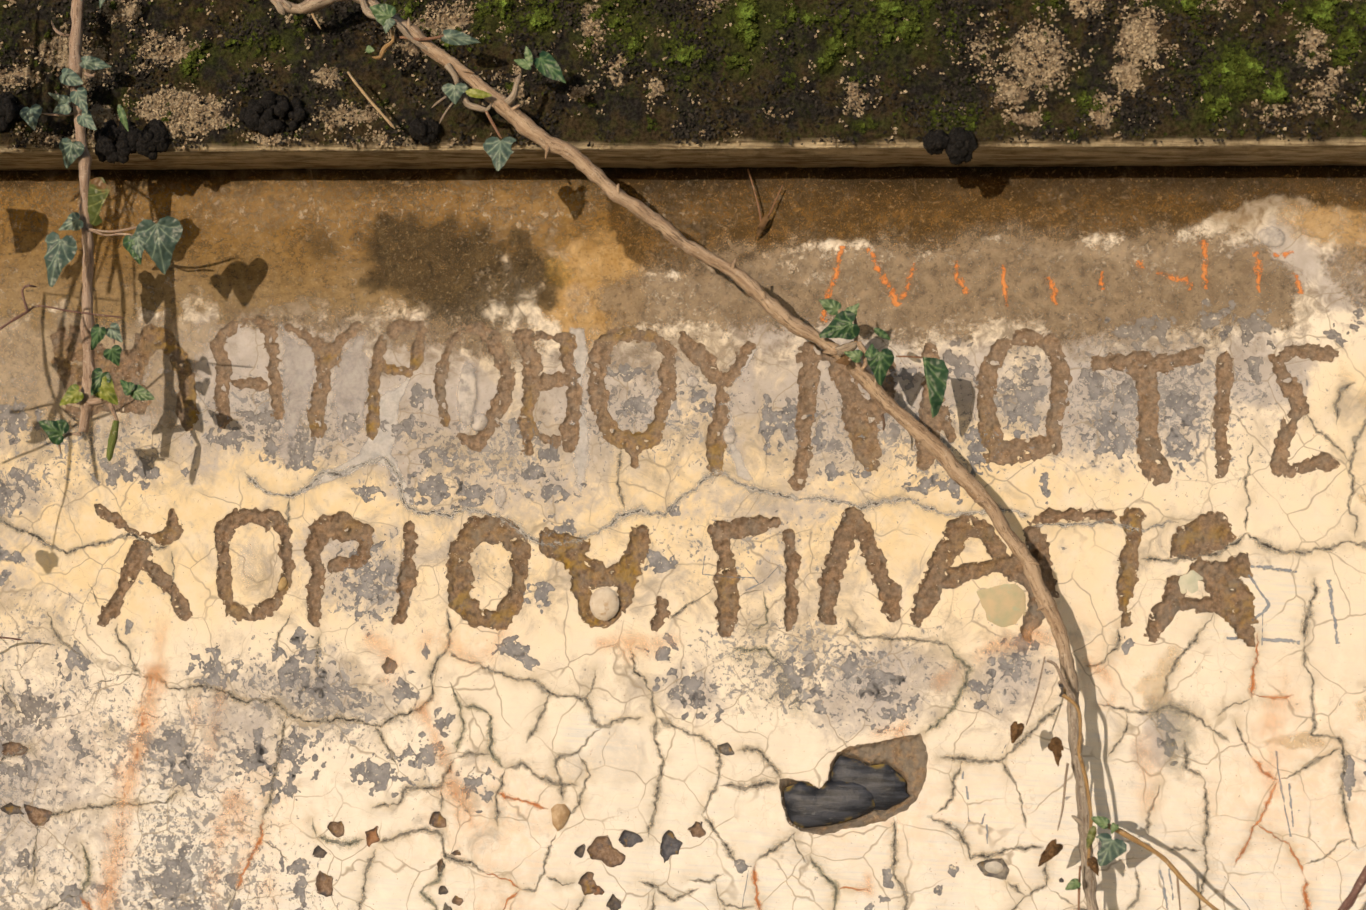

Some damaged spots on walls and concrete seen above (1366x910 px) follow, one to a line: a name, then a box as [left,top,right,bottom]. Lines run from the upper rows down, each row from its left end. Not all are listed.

leakage [0,165,1366,466]
leakage [573,405,589,489]
crack [0,518,175,587]
crack [247,384,1366,910]
crack [91,587,863,910]
crack [46,845,92,910]
crack [32,792,178,876]
flaking render [279,821,344,910]
flaking render [365,826,380,847]
flaking render [437,850,463,910]
flaking render [574,830,643,910]
flaking render [660,821,706,863]